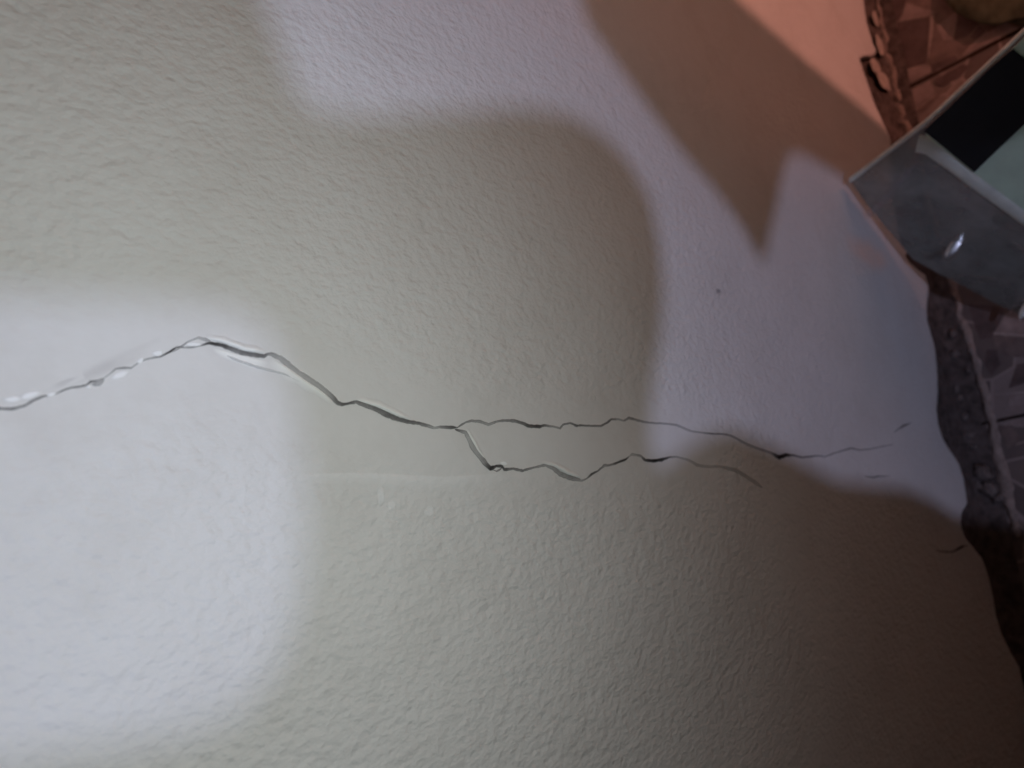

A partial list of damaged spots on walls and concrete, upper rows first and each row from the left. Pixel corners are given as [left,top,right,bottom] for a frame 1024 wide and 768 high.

crack [0,331,910,488]